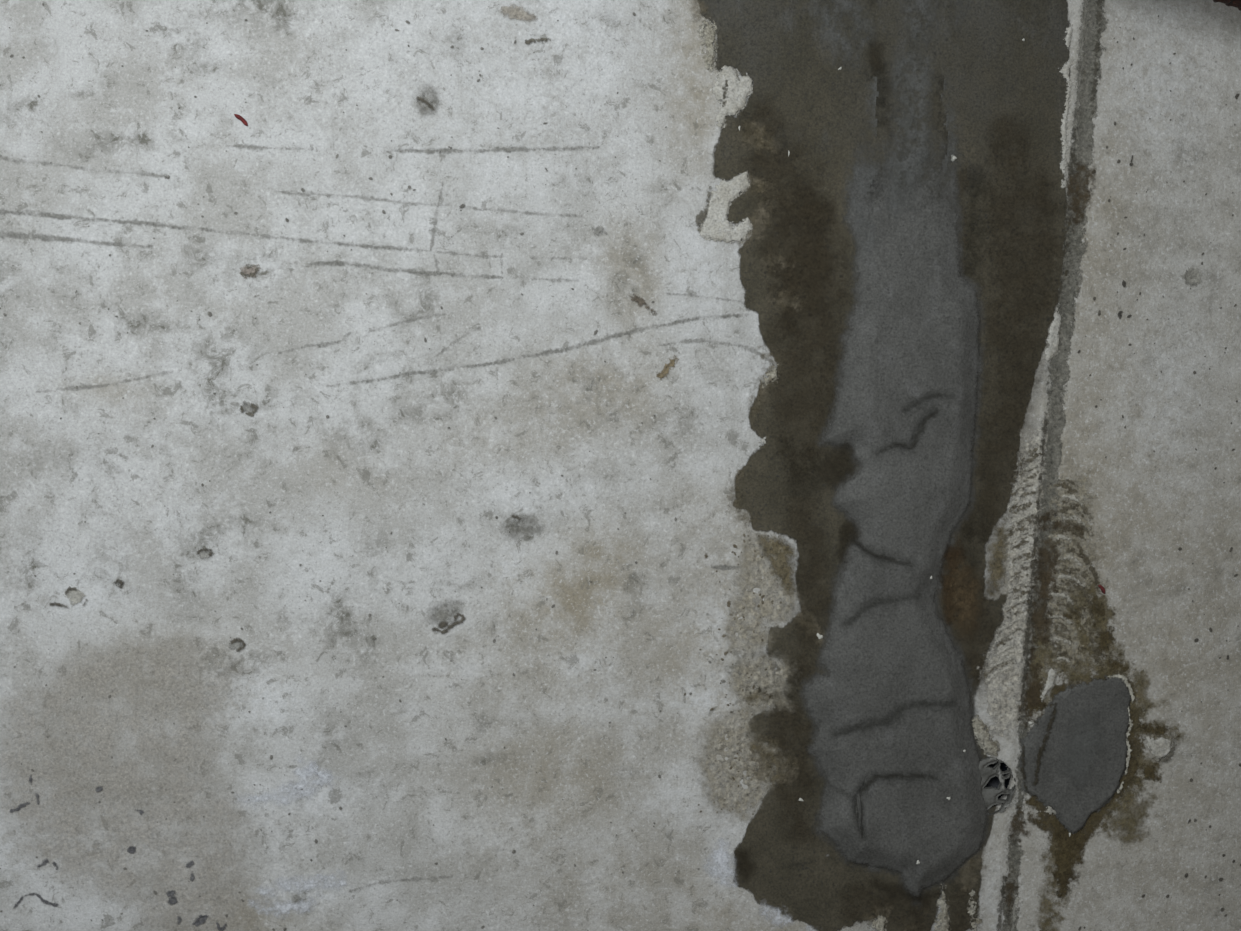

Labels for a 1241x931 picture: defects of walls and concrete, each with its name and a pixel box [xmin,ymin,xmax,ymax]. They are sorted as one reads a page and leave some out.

water stain [693,0,1072,931]
water stain [1024,583,1181,931]